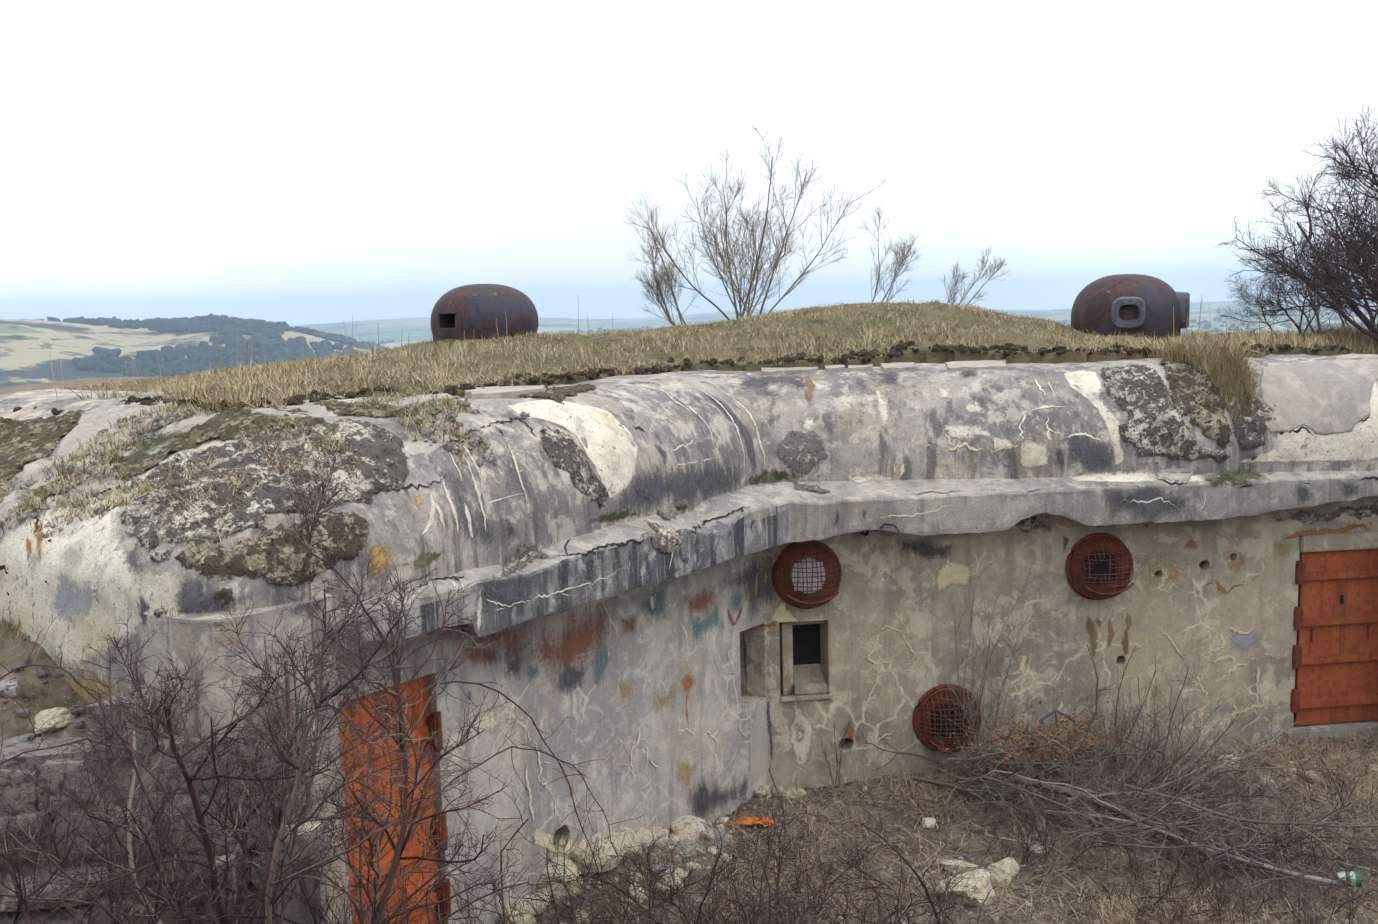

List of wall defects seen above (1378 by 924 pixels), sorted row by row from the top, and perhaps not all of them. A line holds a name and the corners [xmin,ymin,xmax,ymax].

water stain [875,372,899,428]
spalling [1064,364,1378,465]
water stain [934,387,1212,522]
water stain [1298,487,1311,501]
water stain [128,551,143,574]
crack [488,505,760,620]
water stain [177,578,225,624]
crack [854,613,916,682]